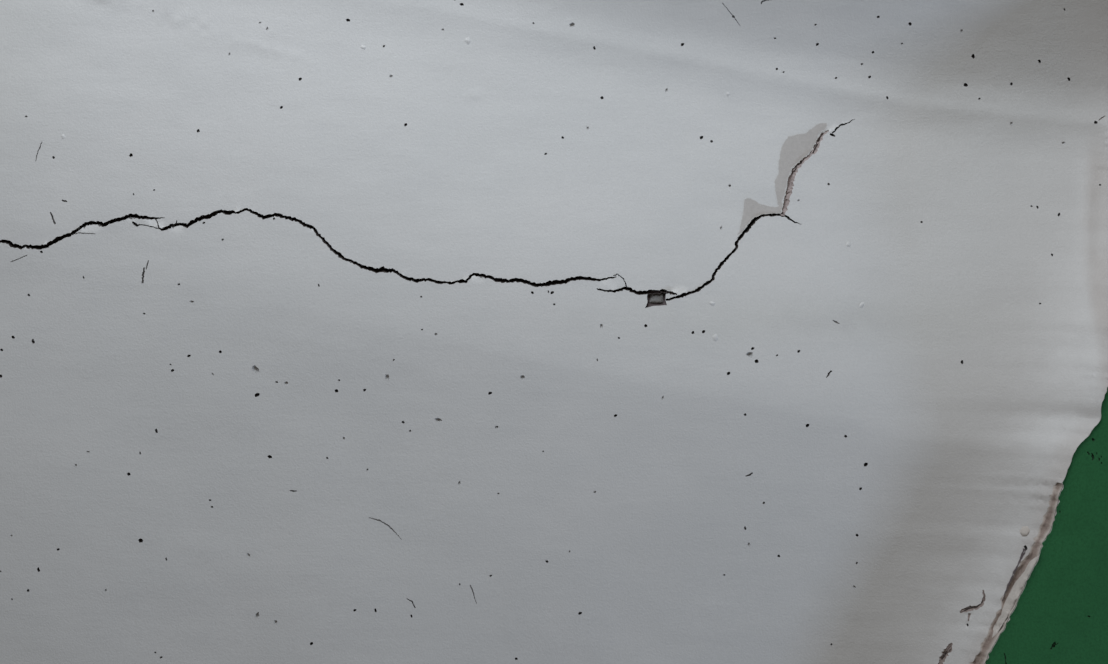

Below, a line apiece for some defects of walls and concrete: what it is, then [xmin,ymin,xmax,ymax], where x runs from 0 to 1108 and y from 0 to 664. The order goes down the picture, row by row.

crack [0,119,854,301]